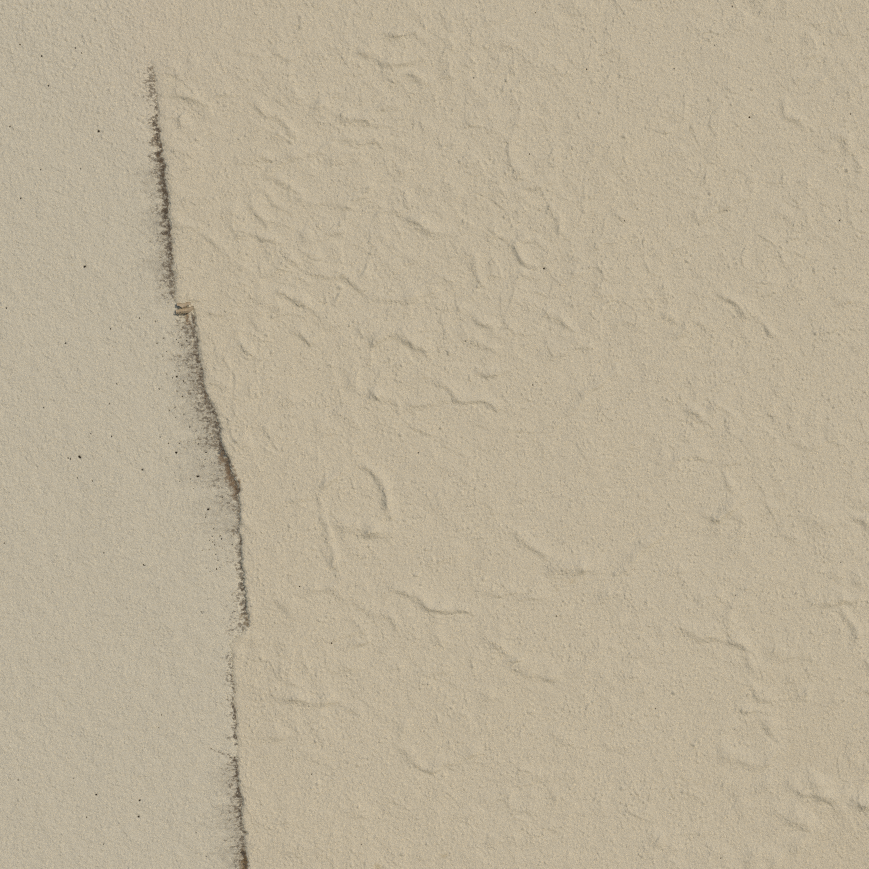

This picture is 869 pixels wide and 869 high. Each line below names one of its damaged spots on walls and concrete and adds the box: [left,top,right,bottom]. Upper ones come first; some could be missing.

crack [152,114,173,272]
crack [214,675,246,854]